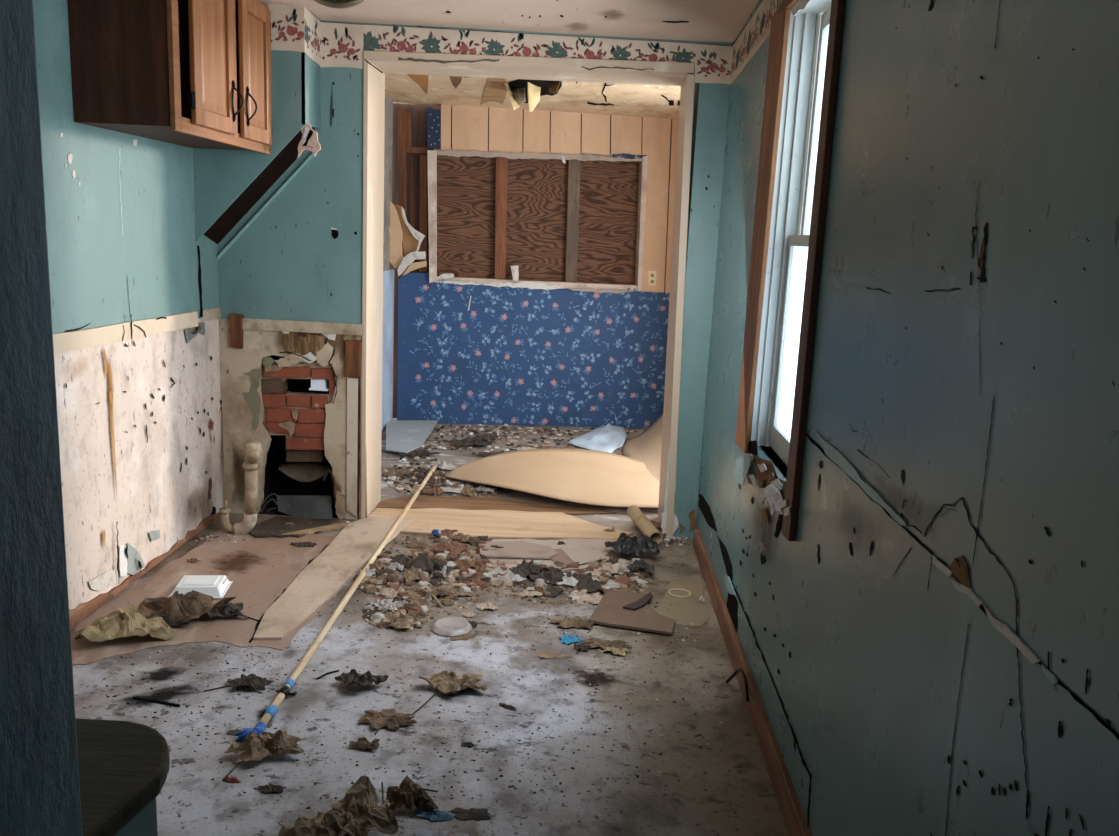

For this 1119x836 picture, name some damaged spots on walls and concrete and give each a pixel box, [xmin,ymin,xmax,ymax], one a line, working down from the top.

spalling [185,322,205,343]
spalling [242,331,336,462]
spalling [949,556,971,588]
crack [806,180,1119,836]